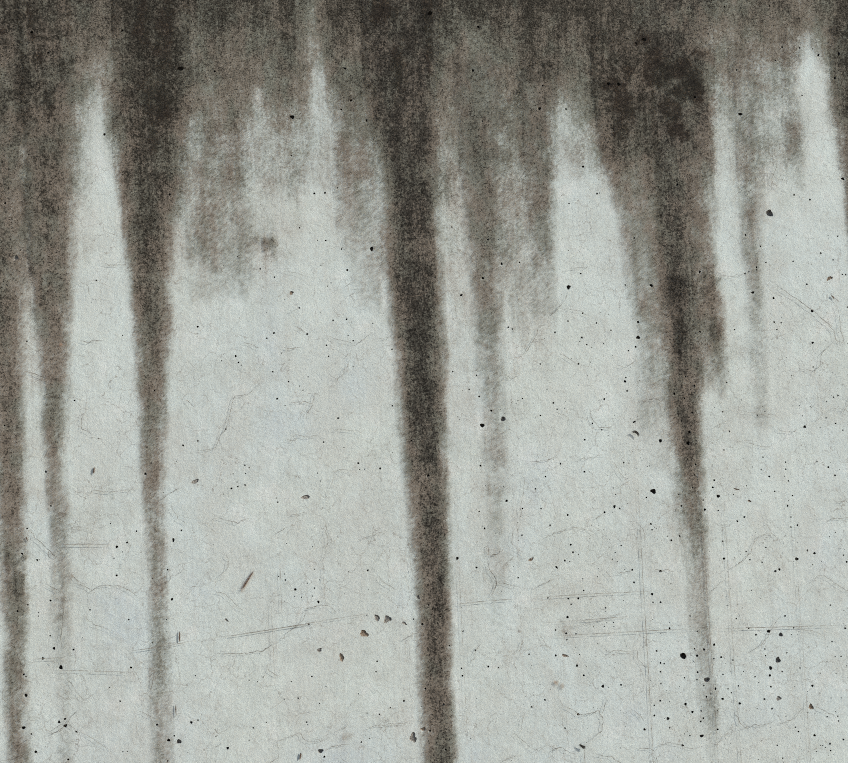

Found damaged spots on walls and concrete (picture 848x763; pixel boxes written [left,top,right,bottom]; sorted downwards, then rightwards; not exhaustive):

water stain [262,236,278,252]
water stain [710,316,723,341]